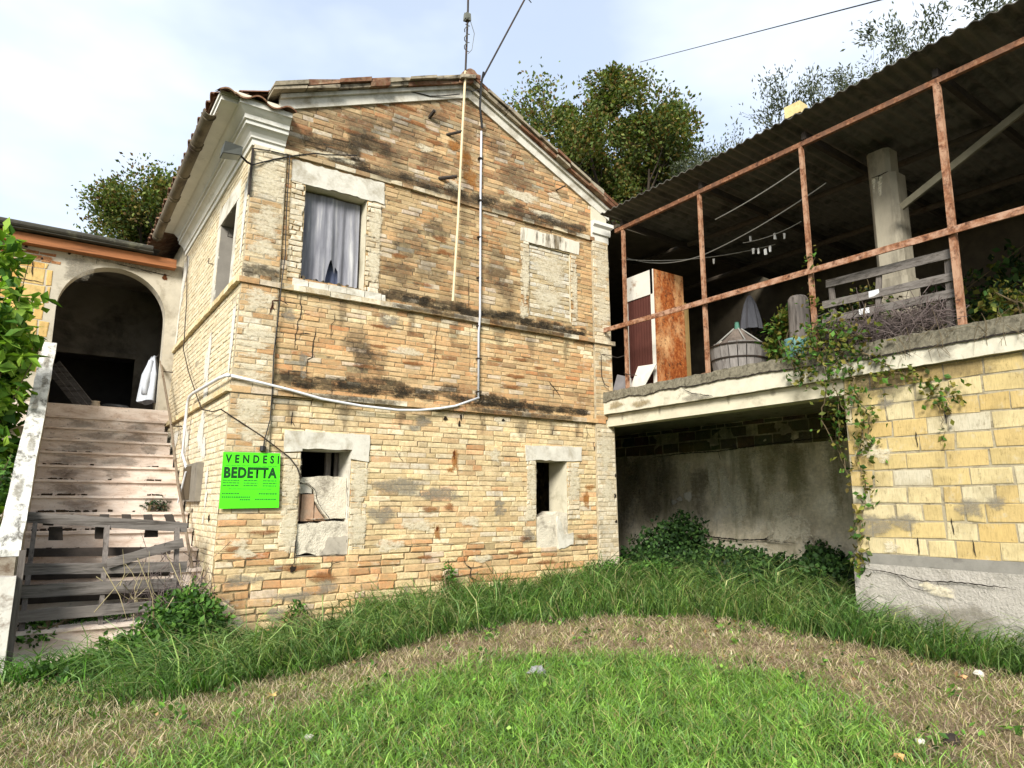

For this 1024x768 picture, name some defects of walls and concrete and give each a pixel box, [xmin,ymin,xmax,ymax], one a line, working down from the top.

water stain [304,130,588,235]
crack [269,298,335,376]
water stain [381,288,586,336]
water stain [277,372,588,420]
water stain [616,426,805,522]
crack [860,567,1016,592]